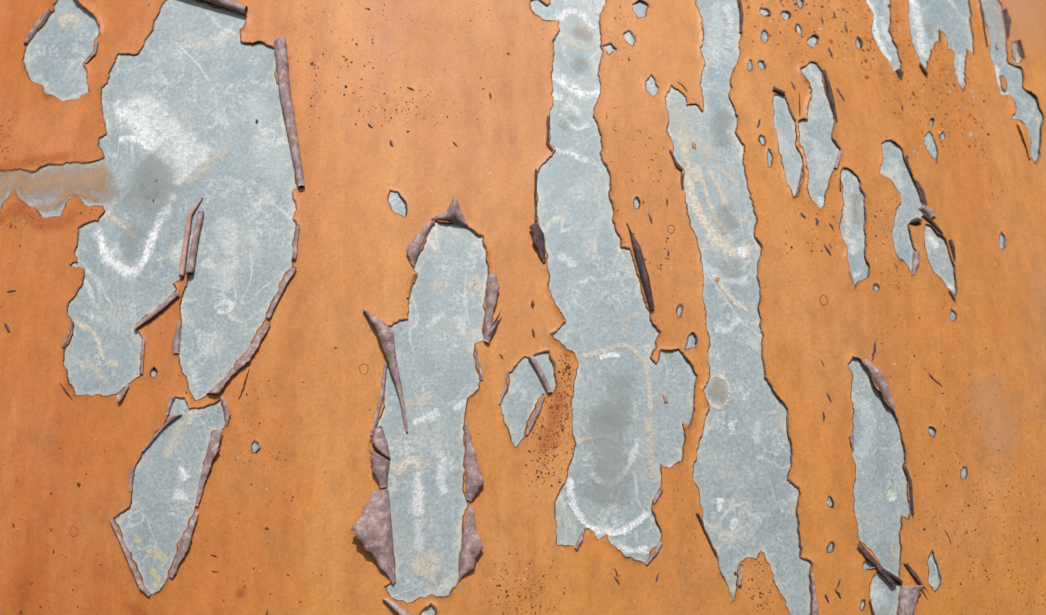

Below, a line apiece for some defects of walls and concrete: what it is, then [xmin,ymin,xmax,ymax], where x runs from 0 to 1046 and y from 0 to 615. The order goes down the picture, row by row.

corrosion [291,0,463,133]
peeling [758,61,880,292]
corrosion [745,0,1003,206]
peeling [908,0,1044,164]
peeling [0,0,305,597]
peeling [351,197,502,615]
corrosion [480,544,565,615]
corrosion [525,345,574,498]
peeling [498,0,819,615]
corrosion [740,554,775,615]
peeling [848,356,942,615]
corrosion [906,368,1046,615]